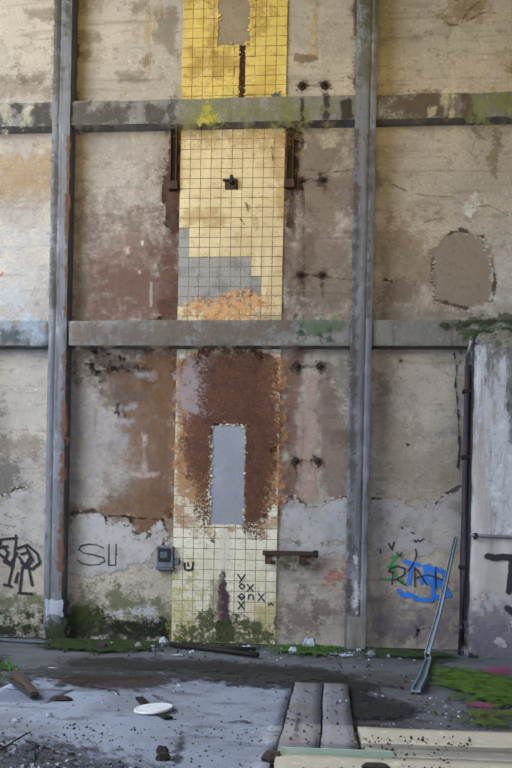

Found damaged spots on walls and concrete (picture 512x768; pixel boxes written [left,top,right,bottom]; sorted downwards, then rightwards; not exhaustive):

spalling [214,0,254,98]
corrosion [162,131,181,234]
peeling [427,228,497,312]
corrosion [107,348,348,540]
peeling [279,494,358,569]
damp [462,340,512,659]
damp [111,601,172,639]
damp [216,571,233,643]
spalling [349,580,362,614]